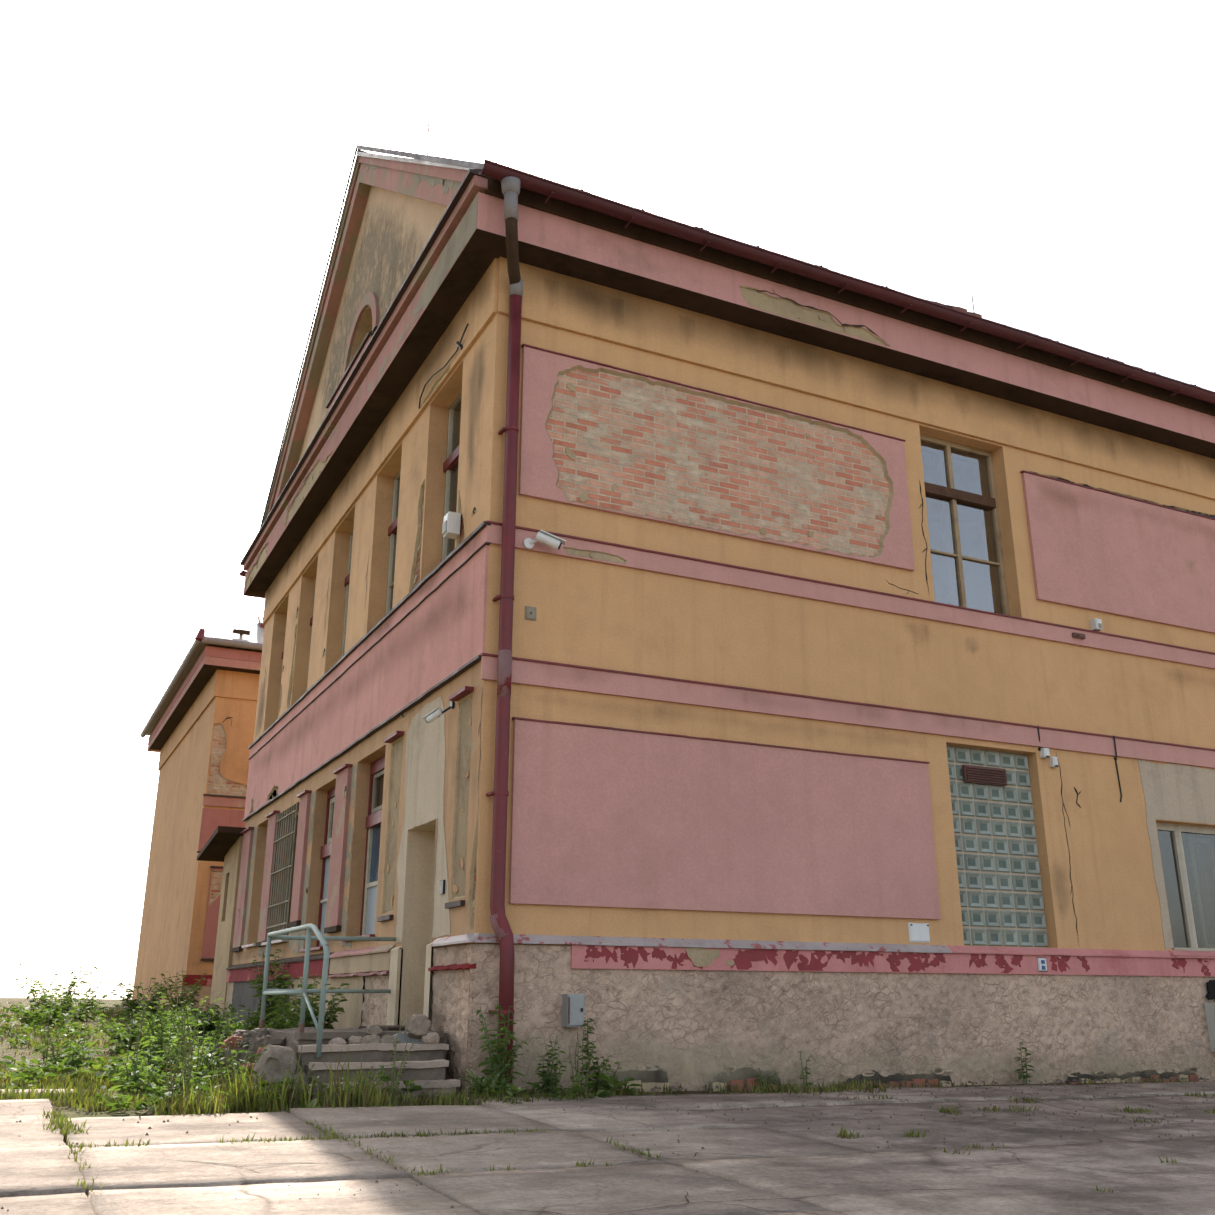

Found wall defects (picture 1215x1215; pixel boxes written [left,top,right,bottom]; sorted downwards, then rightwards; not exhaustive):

leakage [325,221,416,415]
spalling [739,286,890,346]
spalling [285,451,333,528]
spalling [545,365,894,558]
spalling [1022,470,1215,518]
spalling [207,723,278,960]
spalling [382,737,403,914]
spalling [451,694,479,930]
peeling [584,946,946,972]
peeling [969,954,1023,973]
peeling [1050,956,1090,972]
peeling [1171,958,1215,1000]